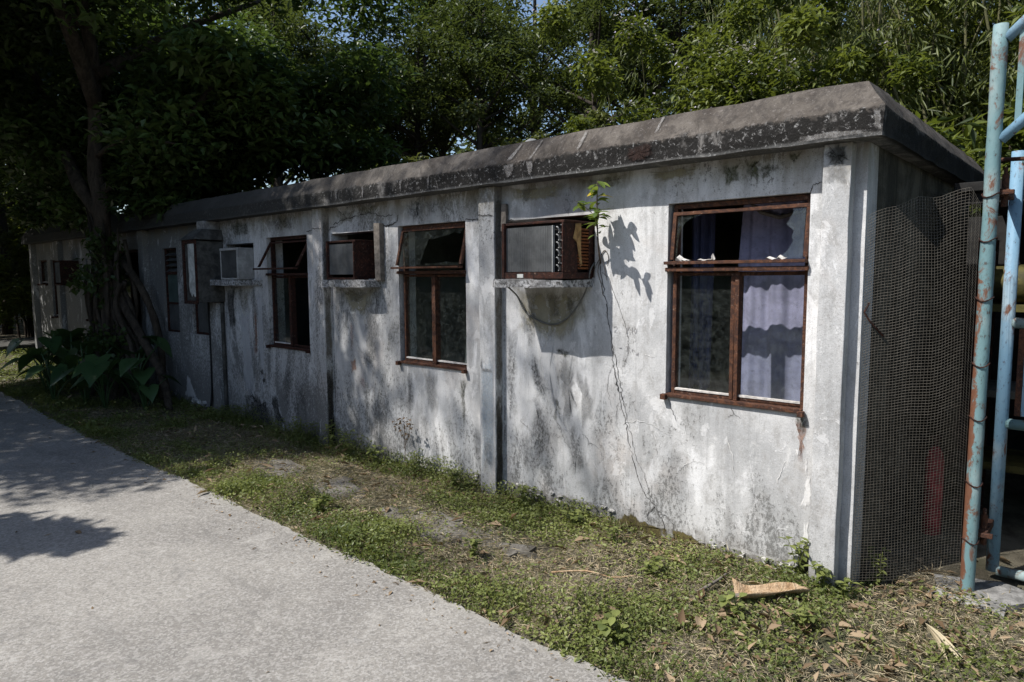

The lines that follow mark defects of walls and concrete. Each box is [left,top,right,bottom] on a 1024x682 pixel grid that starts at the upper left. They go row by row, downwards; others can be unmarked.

leakage [553,349,591,419]
crack [600,266,674,531]